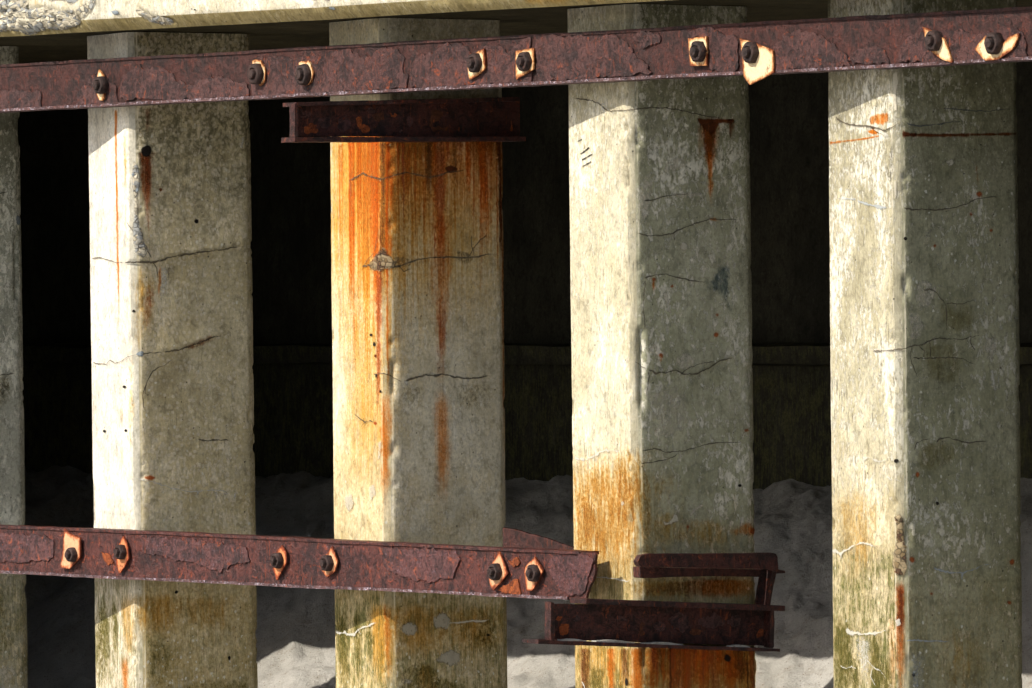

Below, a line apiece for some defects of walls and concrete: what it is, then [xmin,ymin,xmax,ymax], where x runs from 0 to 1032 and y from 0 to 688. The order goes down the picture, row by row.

spalling [0,0,95,35]
rust [686,26,740,72]
rust [773,29,852,70]
rust [898,26,1028,64]
rust [0,533,55,563]
rust [498,557,522,595]
rust [547,553,595,596]